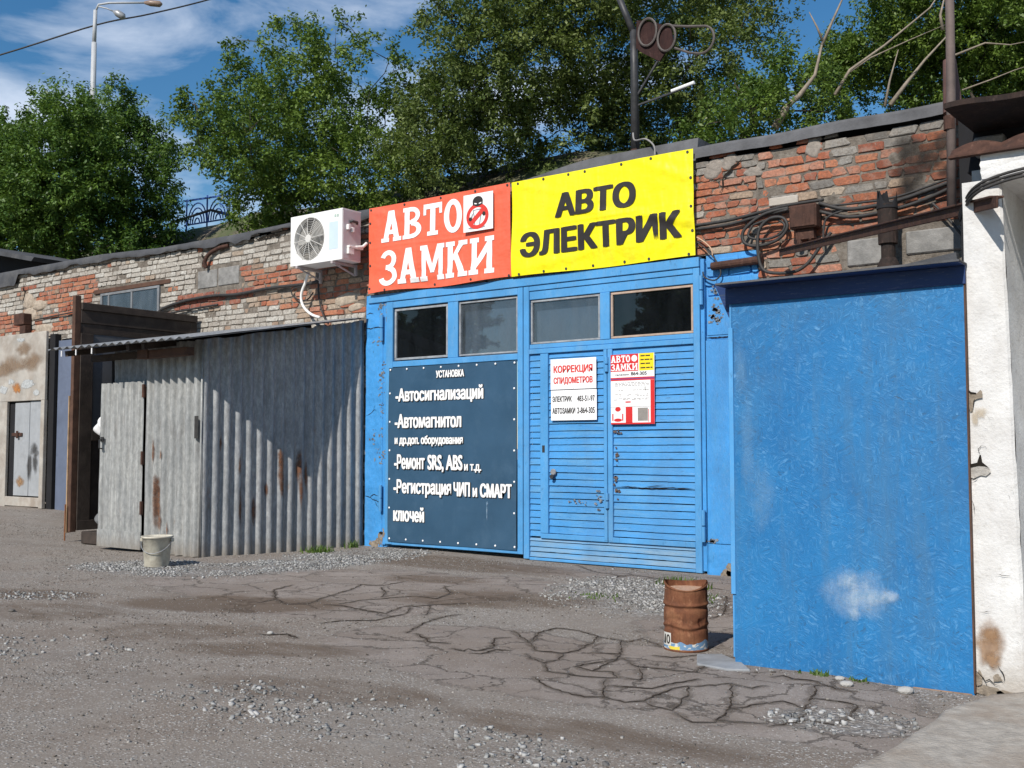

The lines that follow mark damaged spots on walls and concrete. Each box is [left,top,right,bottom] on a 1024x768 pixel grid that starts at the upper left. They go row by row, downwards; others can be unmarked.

peeling [708,285,724,325]
spalling [969,390,982,412]
rust [278,449,307,501]
spalling [971,455,991,481]
rust [152,477,167,534]
rust [977,628,1002,668]